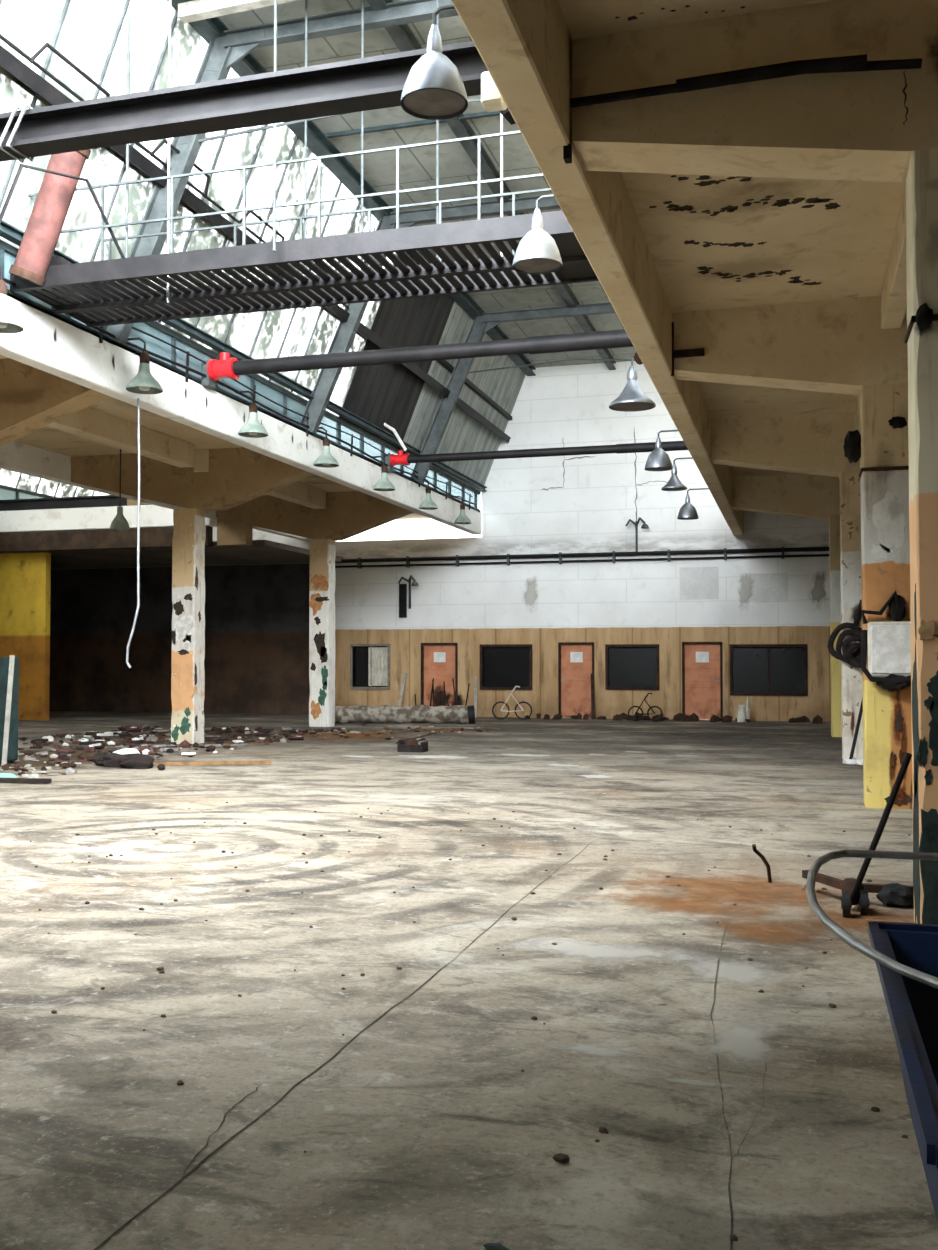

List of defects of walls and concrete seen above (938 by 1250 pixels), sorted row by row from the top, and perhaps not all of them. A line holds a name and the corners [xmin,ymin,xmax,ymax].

peeling [172,566,201,685]
peeling [309,574,329,720]
peeling [171,707,198,742]
corrosion [889,693,907,803]
peeling [885,583,938,925]
corrosion [626,878,904,941]
crack [94,840,595,1250]